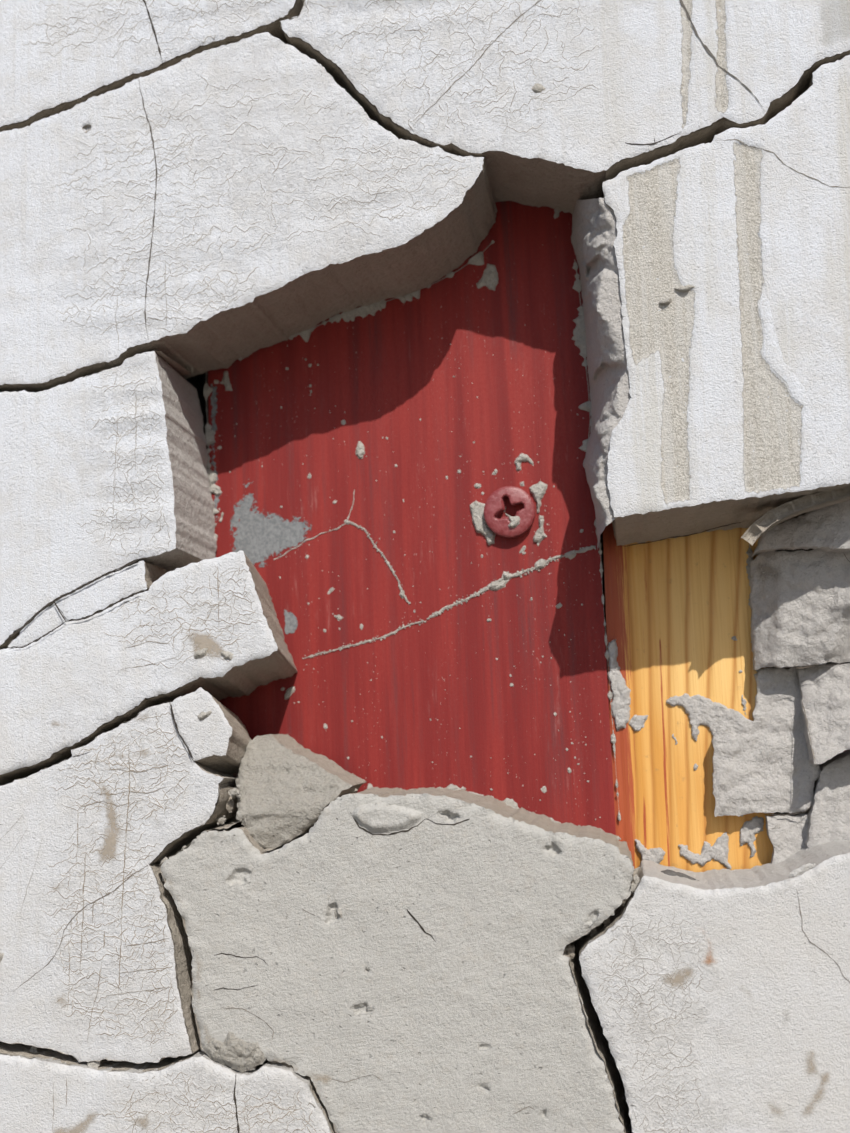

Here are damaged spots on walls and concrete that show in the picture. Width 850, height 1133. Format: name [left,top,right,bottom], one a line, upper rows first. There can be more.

peeling [680,0,693,128]
peeling [715,0,729,113]
crack [606,0,850,188]
peeling [571,159,695,548]
peeling [214,478,312,567]
peeling [283,609,298,634]
crack [0,0,602,1133]
spalling [711,142,850,877]
crack [793,661,847,669]
crack [770,808,809,816]
crack [563,866,715,1133]
crack [797,892,850,983]